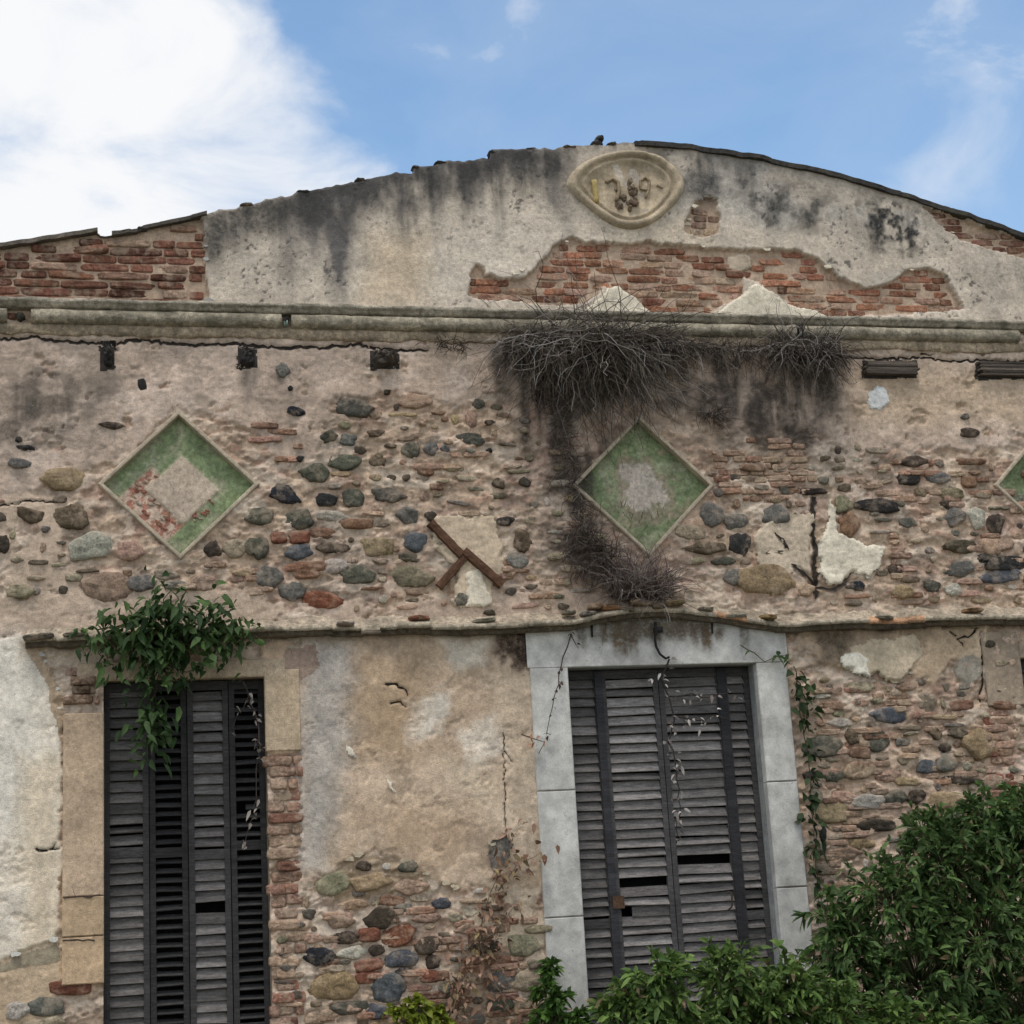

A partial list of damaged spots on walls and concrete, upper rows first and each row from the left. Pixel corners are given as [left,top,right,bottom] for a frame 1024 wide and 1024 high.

spalling [0,219,214,311]
spalling [469,197,962,322]
leakage [866,203,919,247]
crack [0,335,428,352]
leakage [668,360,837,448]
leakage [520,362,609,564]
crack [765,497,851,599]
crack [385,683,408,706]
peeling [840,634,923,684]